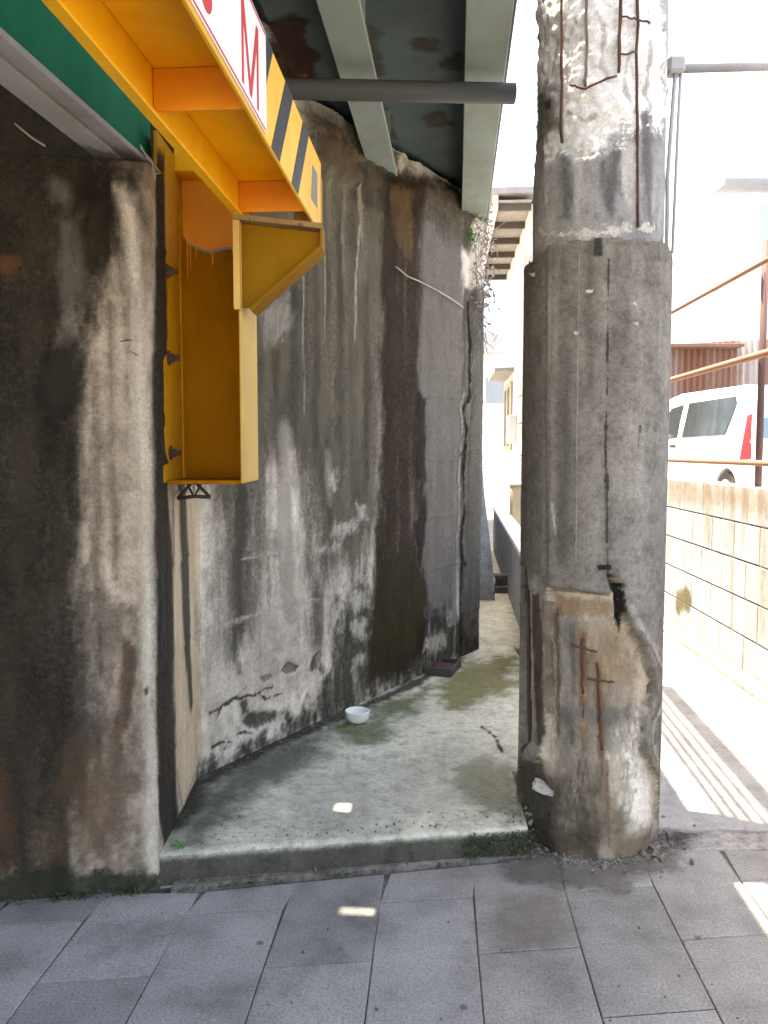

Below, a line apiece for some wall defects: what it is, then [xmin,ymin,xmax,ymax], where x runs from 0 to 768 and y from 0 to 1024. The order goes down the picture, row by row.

rust [267,15,321,78]
spalling [534,0,667,243]
water stain [0,121,532,903]
crack [455,301,475,656]
crack [602,330,610,575]
crack [209,685,282,749]
spalling [517,563,664,860]